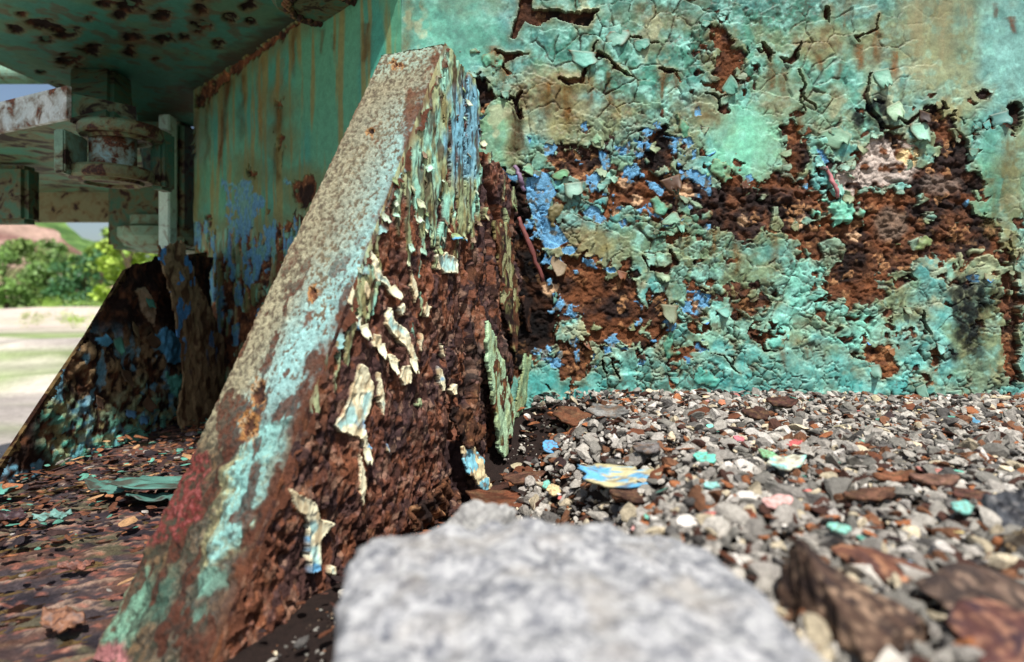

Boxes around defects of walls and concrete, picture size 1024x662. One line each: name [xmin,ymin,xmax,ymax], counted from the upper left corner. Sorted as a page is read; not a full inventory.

rust [9,0,226,88]
crack [494,0,678,120]
crack [761,40,818,112]
crack [823,5,831,23]
crack [862,72,928,131]
peeling [194,163,317,384]
peeling [309,7,1024,504]
peeling [136,287,183,396]
rust [483,218,532,457]
rust [239,380,266,439]
peeling [289,488,337,574]
rust [407,470,547,533]